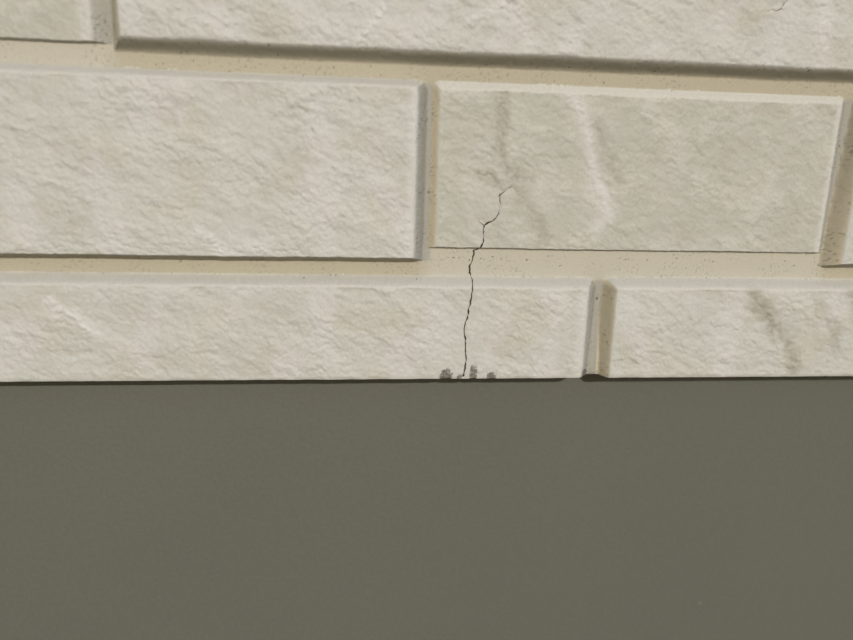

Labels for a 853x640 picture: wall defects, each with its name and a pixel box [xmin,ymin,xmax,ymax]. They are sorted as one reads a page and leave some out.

crack [462,186,512,377]